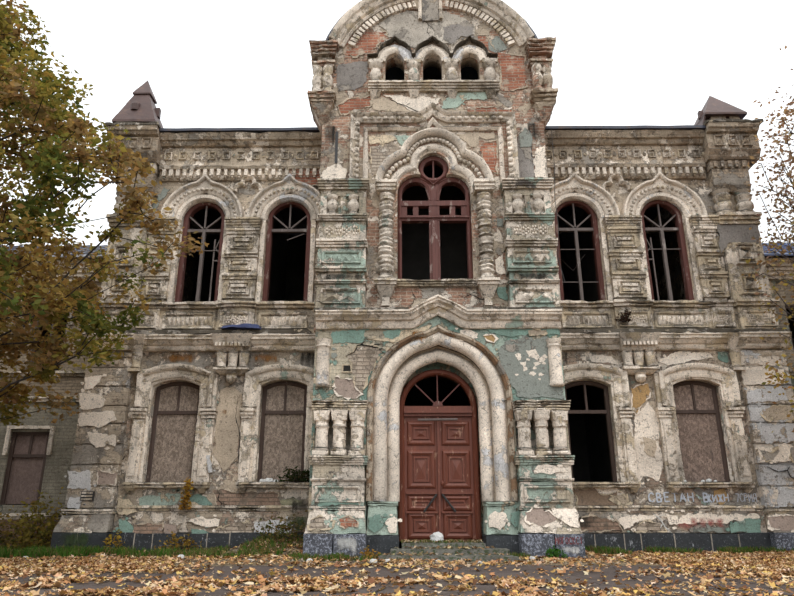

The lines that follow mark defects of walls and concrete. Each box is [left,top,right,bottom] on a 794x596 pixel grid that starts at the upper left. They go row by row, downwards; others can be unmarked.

spalling [331,329,402,400]
peeling [483,329,560,354]
peeling [515,349,547,380]
peeling [78,374,120,450]
peeling [630,383,664,485]
peeling [64,470,117,509]
peeling [113,488,296,534]
spalling [307,498,402,533]
peeling [485,486,794,533]